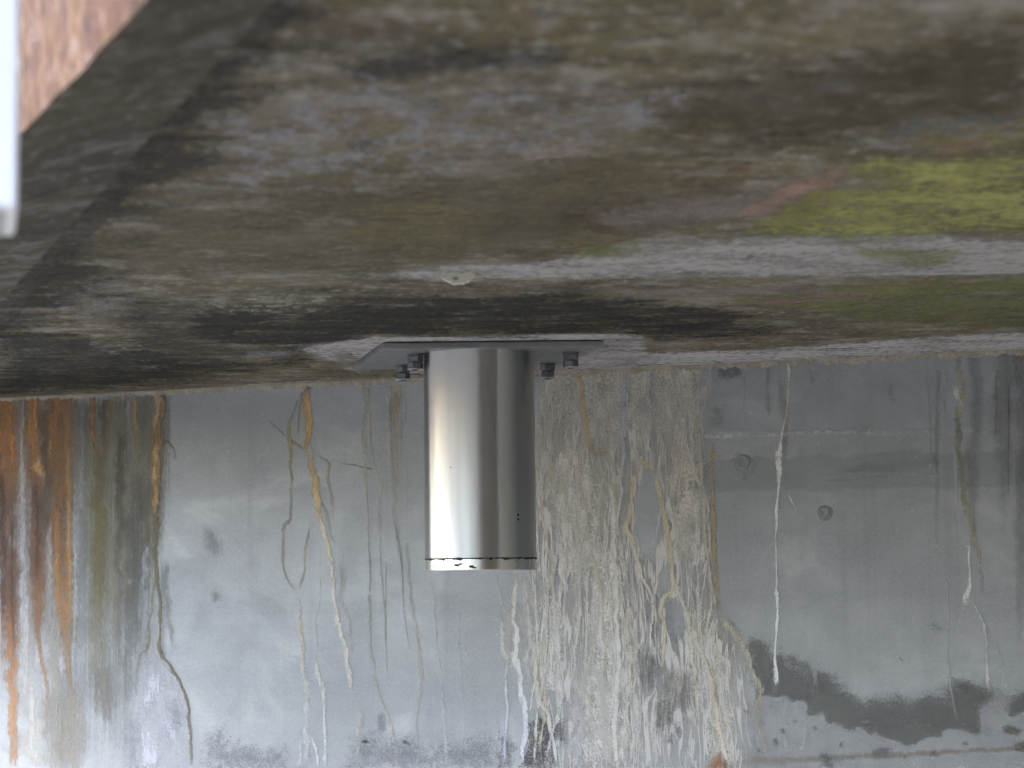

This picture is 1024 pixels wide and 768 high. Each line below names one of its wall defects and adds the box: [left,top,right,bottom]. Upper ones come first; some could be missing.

corrosion [0,398,76,764]
damp [0,265,1024,768]